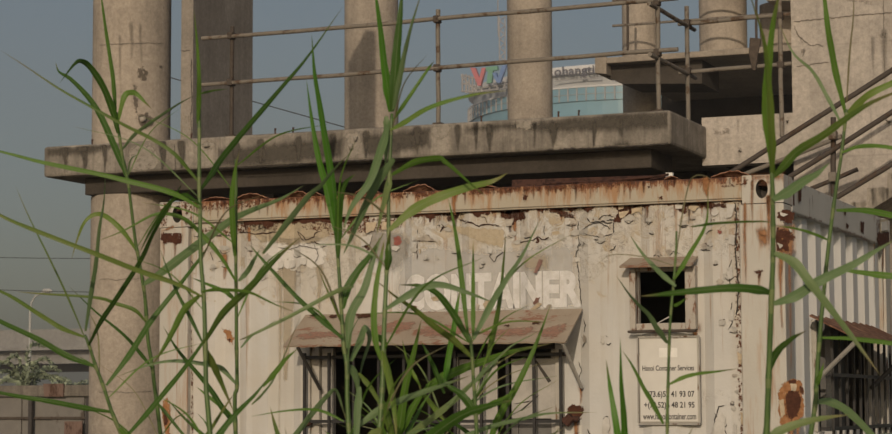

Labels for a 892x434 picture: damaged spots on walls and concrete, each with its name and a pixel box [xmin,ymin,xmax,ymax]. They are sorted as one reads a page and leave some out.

peeling [194,221,334,281]
peeling [361,230,439,268]
rust [160,175,781,282]
peeling [505,218,546,274]
peeling [557,214,613,303]
peeling [700,203,741,333]
rust [758,189,822,333]
rust [734,316,743,434]
rust [161,398,170,434]
rust [567,387,584,434]
rust [777,378,806,434]